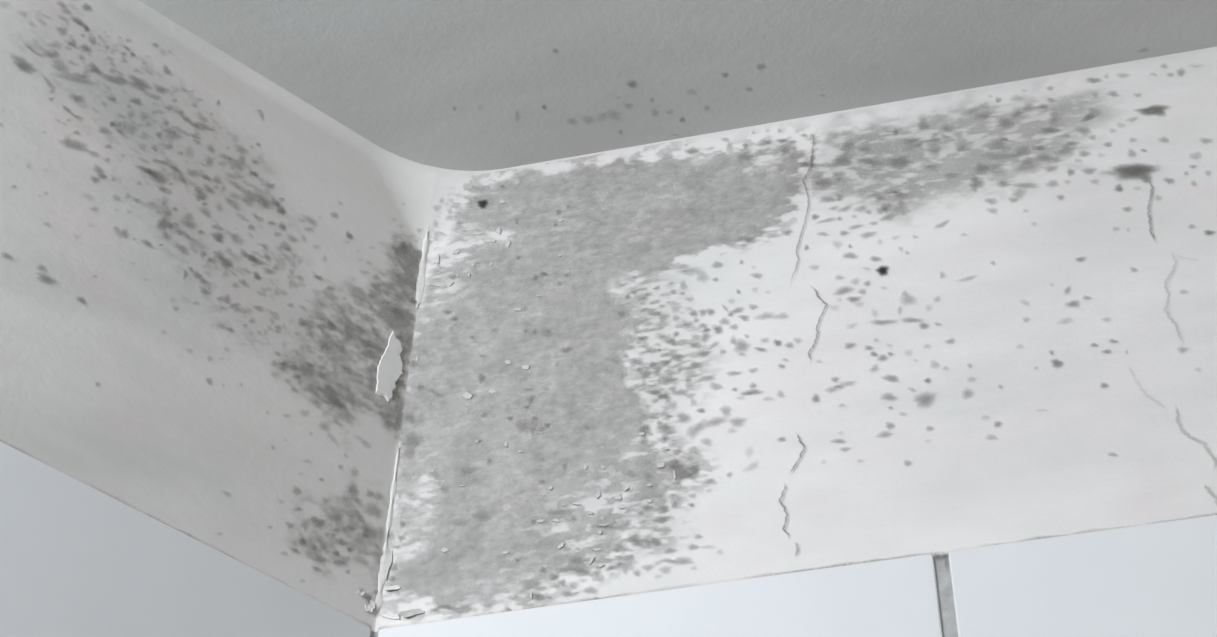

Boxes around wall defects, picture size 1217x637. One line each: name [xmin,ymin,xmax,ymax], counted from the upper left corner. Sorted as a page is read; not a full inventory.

peeling [375,331,418,402]
leakage [321,132,967,613]
crack [808,289,827,358]
crack [779,436,805,534]